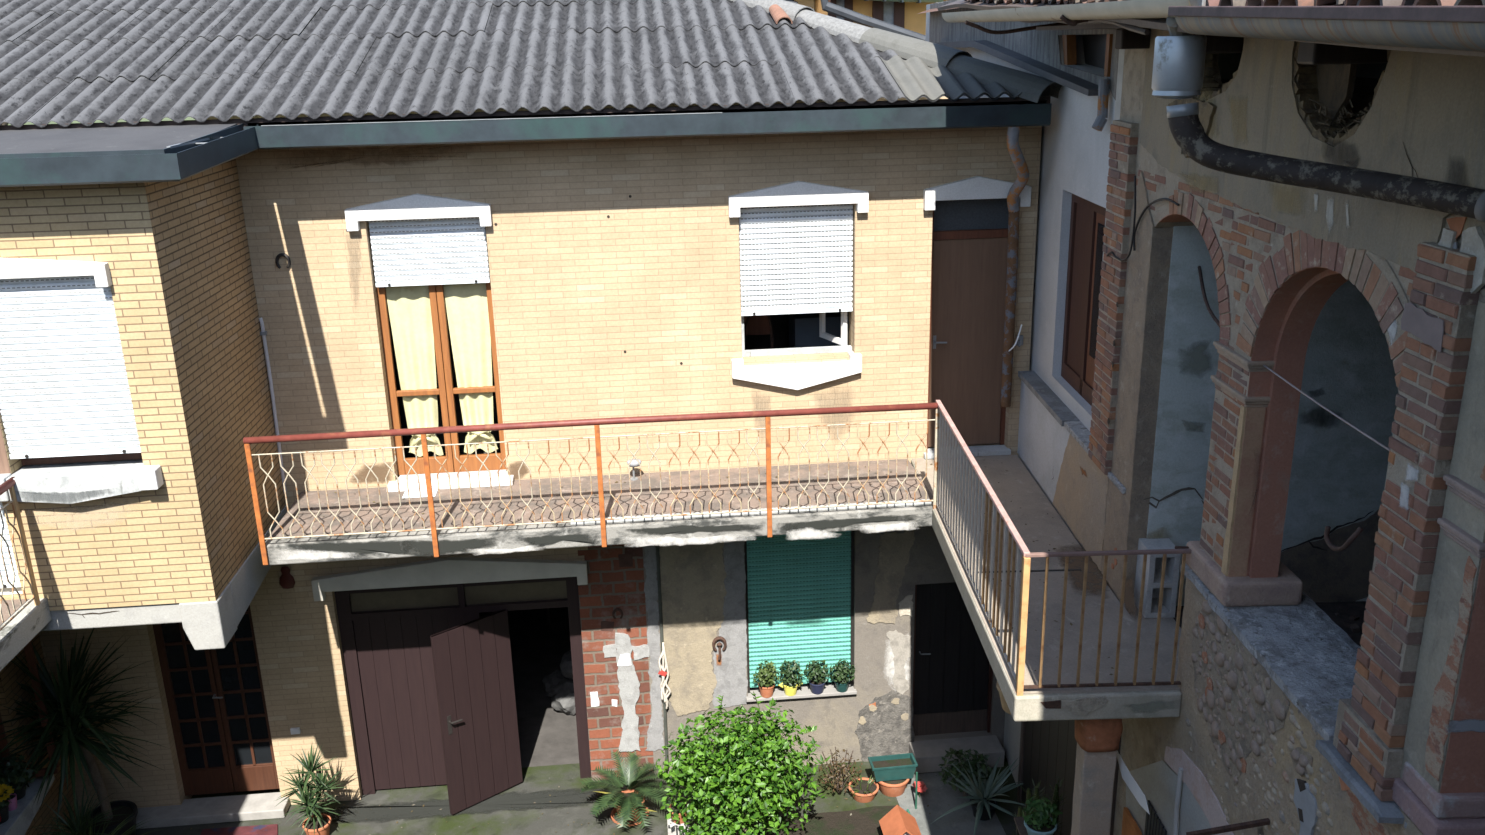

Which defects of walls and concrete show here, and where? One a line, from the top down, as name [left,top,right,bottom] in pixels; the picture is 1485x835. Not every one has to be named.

spalling [1161,54,1239,158]
spalling [1293,42,1391,146]
water stain [284,534,594,560]
water stain [627,524,752,546]
water stain [784,515,913,539]
spalling [601,621,614,631]